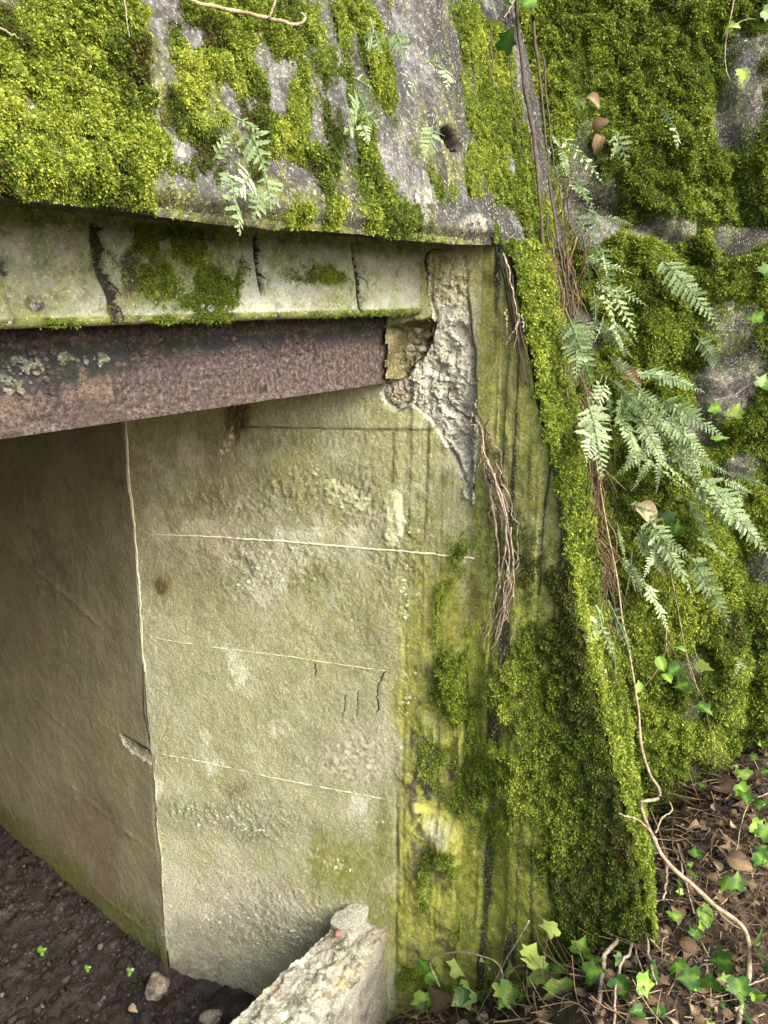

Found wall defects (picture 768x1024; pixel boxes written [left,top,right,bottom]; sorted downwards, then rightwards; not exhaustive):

crack [90,227,124,322]
crack [252,238,266,290]
crack [351,251,369,313]
spalling [379,251,479,507]
leakage [220,403,250,462]
crack [342,671,386,716]